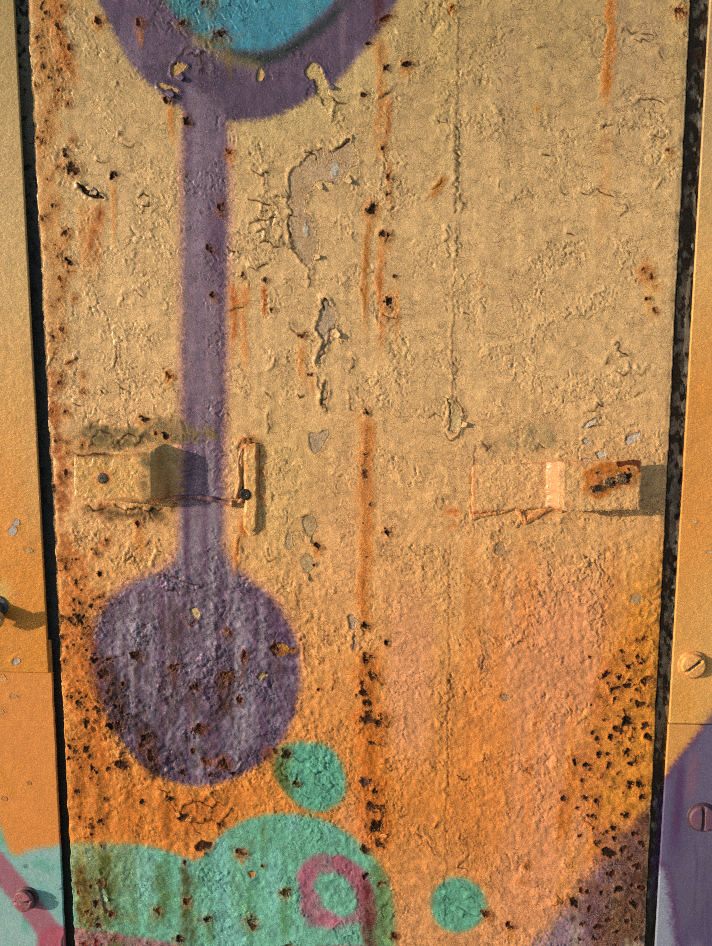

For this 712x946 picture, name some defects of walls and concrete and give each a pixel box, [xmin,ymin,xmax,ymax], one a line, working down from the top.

corrosion [360,40,414,153]
peeling [280,138,358,287]
corrosion [360,202,400,342]
crack [437,3,469,396]
corrosion [31,0,162,850]
peeling [312,298,341,411]
corrosion [356,407,393,630]
corrosion [582,459,640,500]
crack [159,789,233,837]
corrosion [352,651,392,855]
corrosion [553,592,659,946]
corrosion [73,865,131,946]